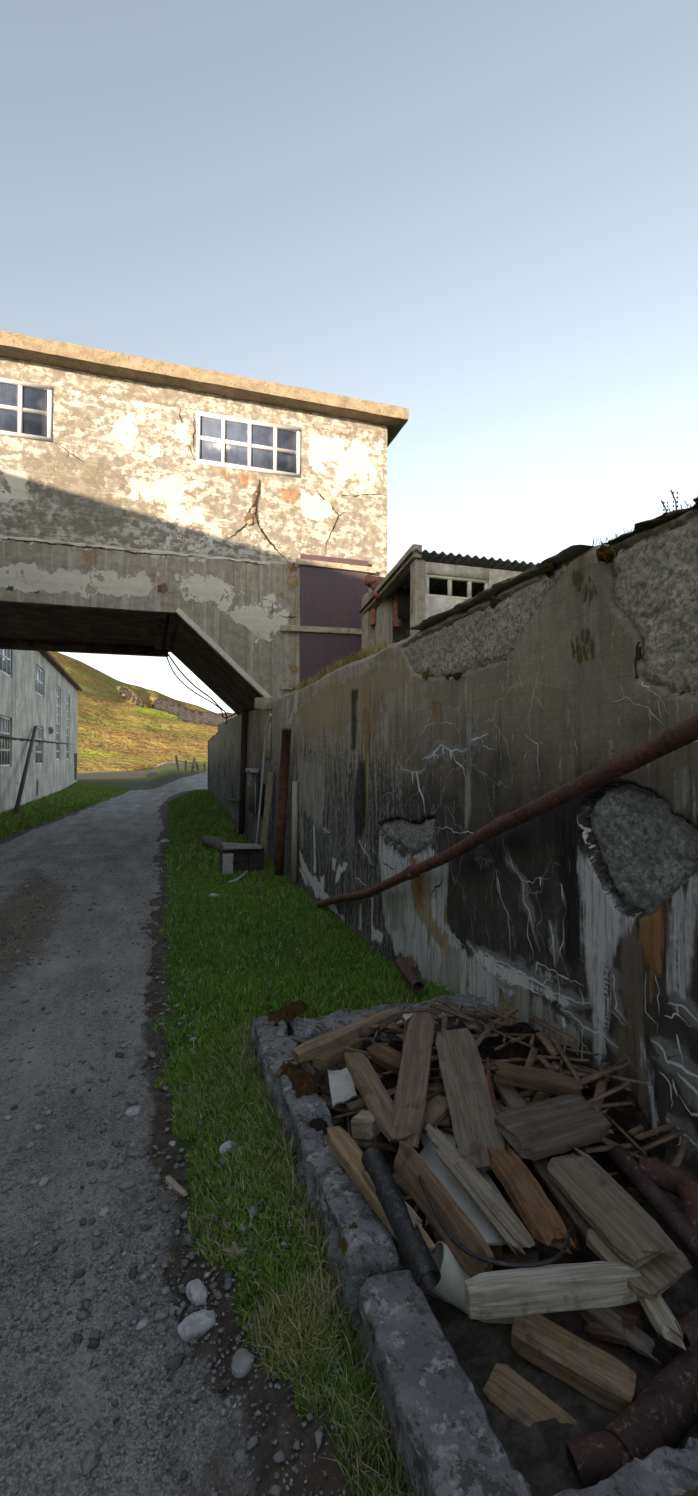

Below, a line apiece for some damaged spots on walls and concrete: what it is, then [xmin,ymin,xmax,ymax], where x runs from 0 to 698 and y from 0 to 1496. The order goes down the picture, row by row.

crack [0,538,193,557]
peeling [0,390,289,646]
crack [229,479,288,563]
peeling [294,433,385,529]
crack [316,490,385,553]
spalling [378,816,436,853]
spalling [577,778,698,917]
damp [292,667,657,1129]
crack [397,667,698,1151]